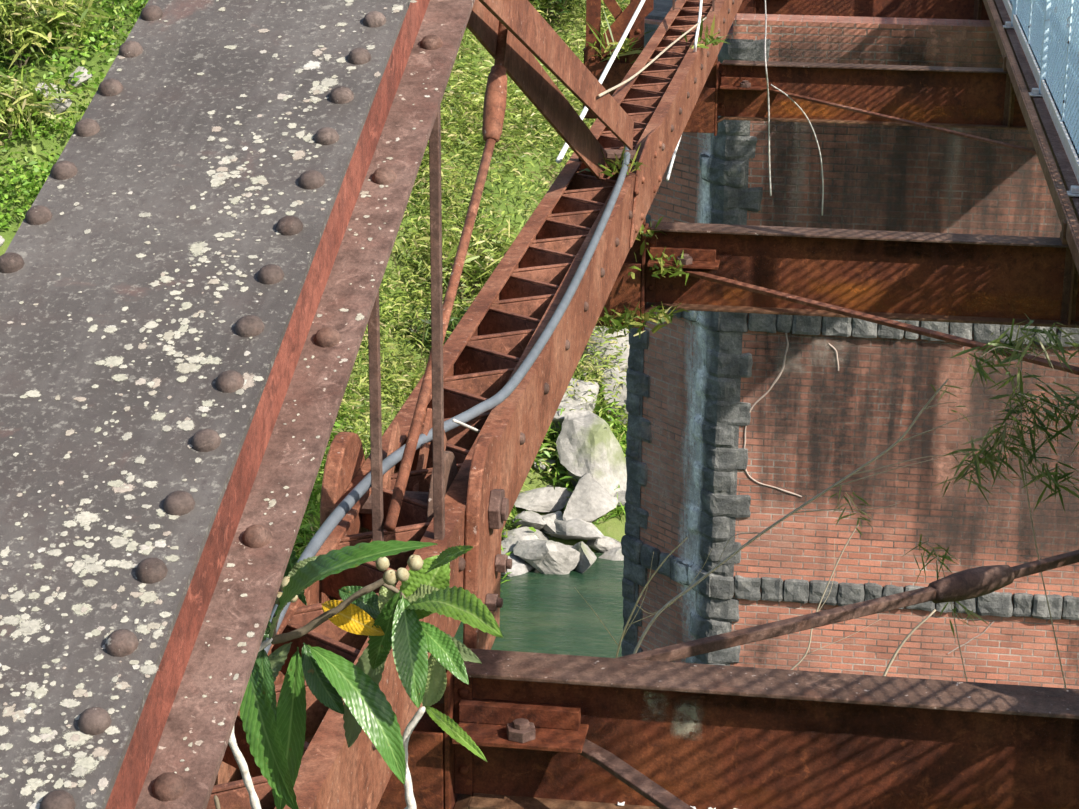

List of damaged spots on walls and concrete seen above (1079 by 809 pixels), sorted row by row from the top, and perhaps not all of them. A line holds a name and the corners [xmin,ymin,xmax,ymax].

corrosion [884,241,929,256]
damp [811,345,871,524]
damp [888,350,932,457]